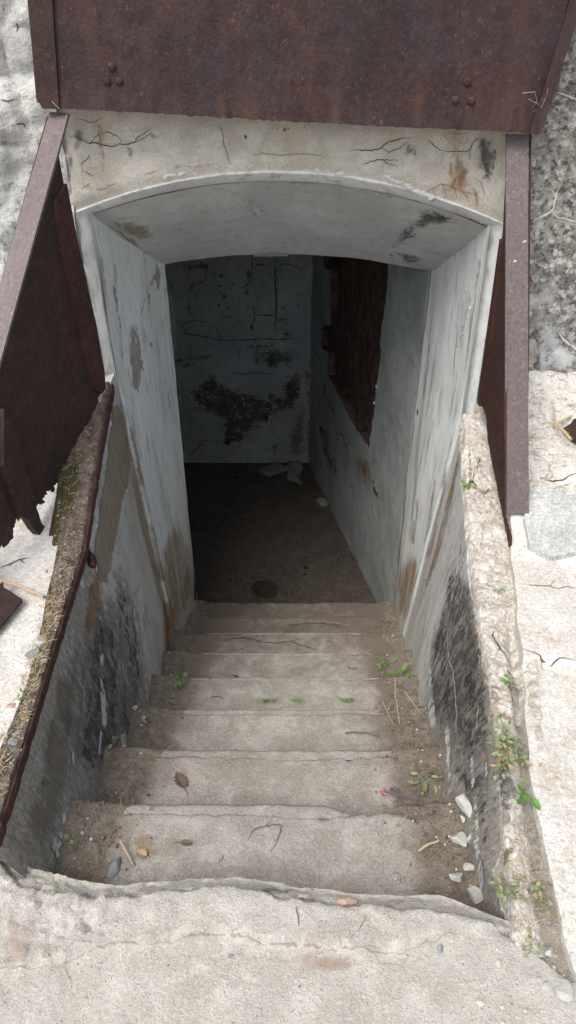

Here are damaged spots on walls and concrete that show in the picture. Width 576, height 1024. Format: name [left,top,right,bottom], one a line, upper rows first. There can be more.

crack [69,117,151,190]
crack [351,134,485,202]
leakage [480,139,496,178]
leakage [401,213,449,241]
peeling [110,263,162,395]
crack [174,257,306,376]
flaking render [185,371,305,446]
corrosion [399,560,416,616]
leakage [32,583,139,862]
leakage [428,560,515,892]